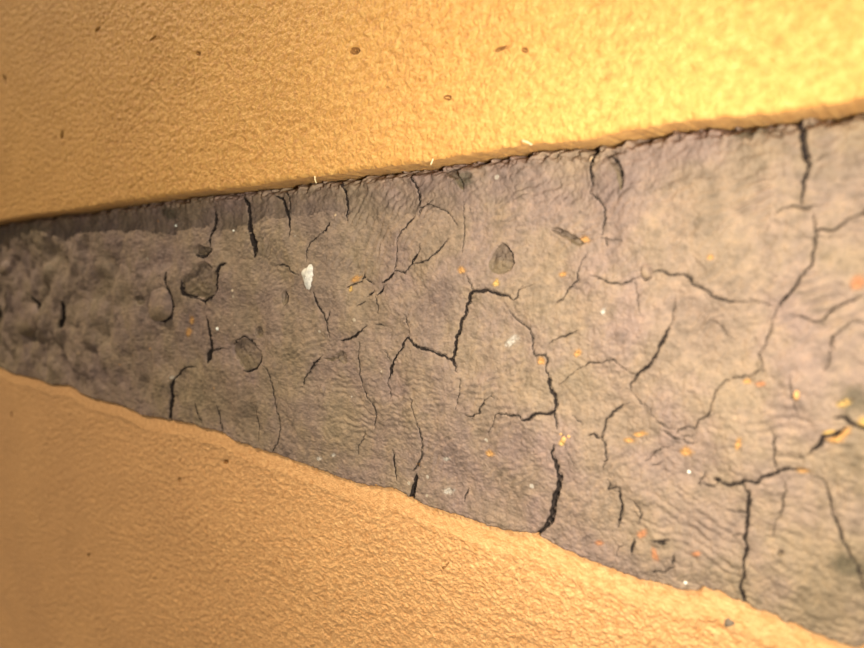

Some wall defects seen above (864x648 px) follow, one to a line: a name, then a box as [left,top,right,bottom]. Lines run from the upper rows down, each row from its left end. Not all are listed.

spalling [606,155,624,190]
spalling [180,245,226,305]
crack [208,210,218,246]
crack [244,198,258,258]
crack [276,182,349,275]
spalling [489,243,515,274]
spalling [552,227,584,246]
crack [169,316,224,430]
spalling [234,326,264,373]
crack [299,120,864,573]
crack [255,364,281,451]
crack [698,416,864,601]